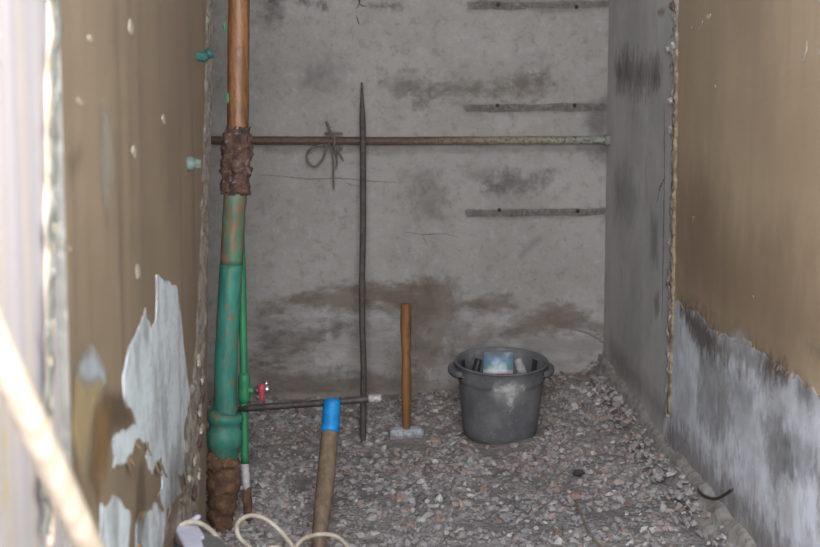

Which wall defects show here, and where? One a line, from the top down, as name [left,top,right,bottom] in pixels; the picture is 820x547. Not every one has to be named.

peeling [100,0,216,547]
damp [288,284,458,368]
peeling [662,0,820,547]